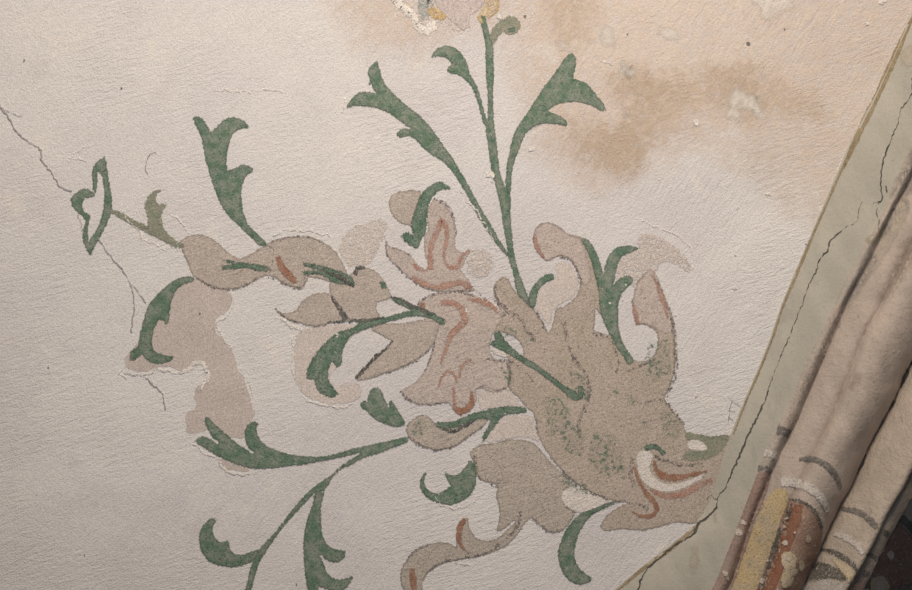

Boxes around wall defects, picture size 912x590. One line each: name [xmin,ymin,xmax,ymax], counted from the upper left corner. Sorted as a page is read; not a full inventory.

peeling [392,0,461,36]
crack [0,105,72,191]
damp [493,0,912,208]
crack [78,216,146,332]
crack [637,78,912,590]